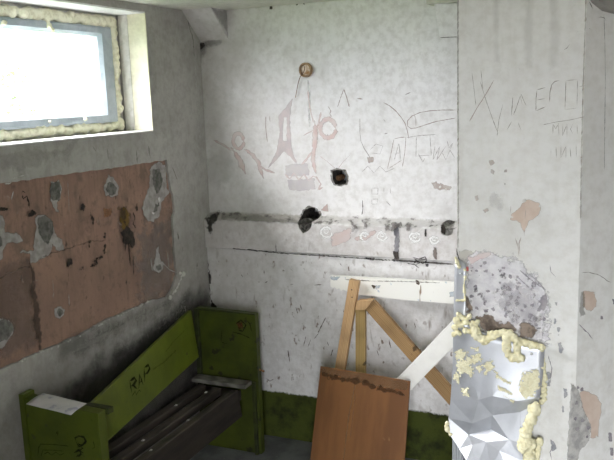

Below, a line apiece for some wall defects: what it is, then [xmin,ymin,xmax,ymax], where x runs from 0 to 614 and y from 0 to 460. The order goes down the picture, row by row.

spalling [330,168,349,186]
spalling [298,205,328,233]
flaking render [0,160,186,369]
crack [233,246,453,265]
spalling [456,199,560,346]
spalling [583,291,597,312]
spalling [562,385,601,460]